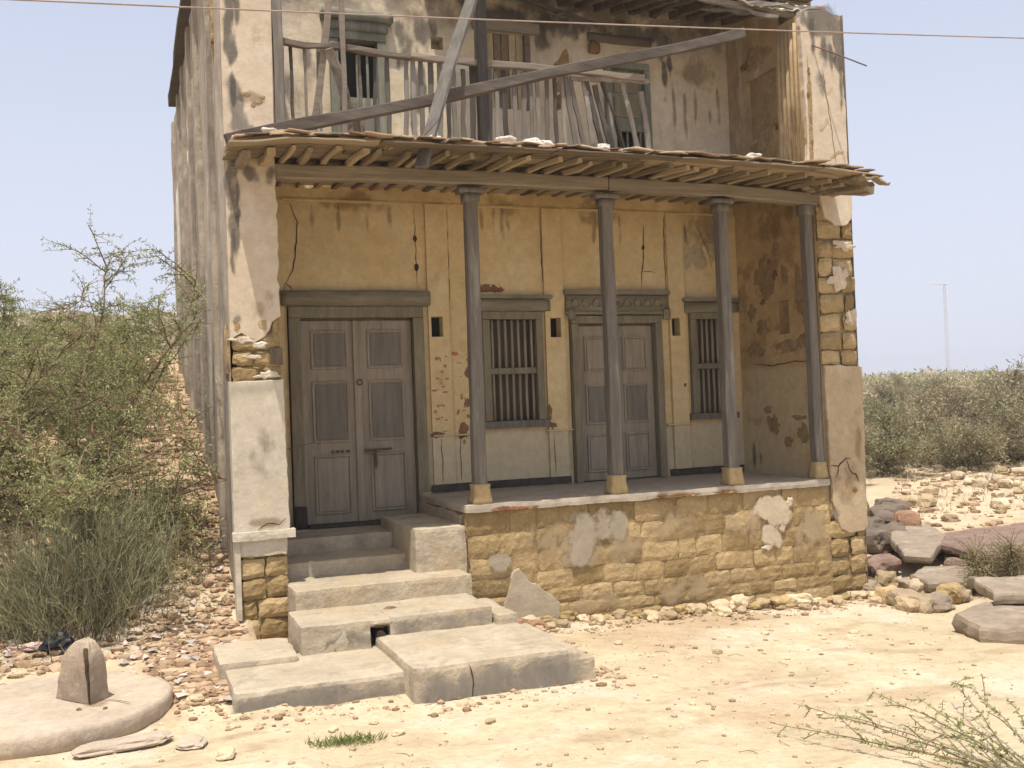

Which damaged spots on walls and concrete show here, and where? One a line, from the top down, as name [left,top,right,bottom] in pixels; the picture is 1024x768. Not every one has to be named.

crack [284,204,298,290]
crack [412,210,420,287]
flaking render [480,284,504,293]
crack [641,217,666,290]
flaking render [746,242,806,358]
flaking render [816,195,857,366]
flaking render [224,319,281,382]
flaking render [430,422,470,444]
crack [831,458,859,493]